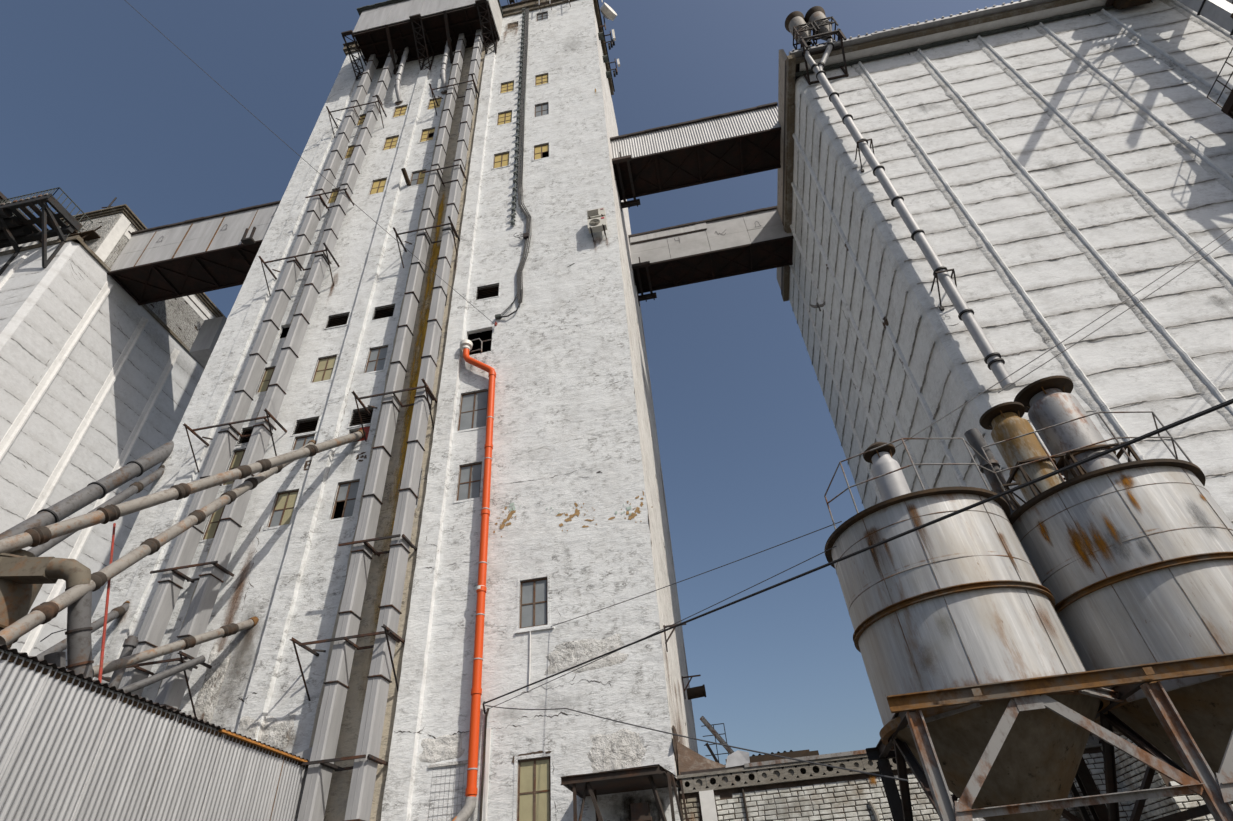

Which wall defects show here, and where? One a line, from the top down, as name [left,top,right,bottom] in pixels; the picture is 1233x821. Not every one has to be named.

rust [1121,475,1140,508]
peeling [493,502,521,537]
peeling [546,492,652,544]
rust [1072,518,1117,566]